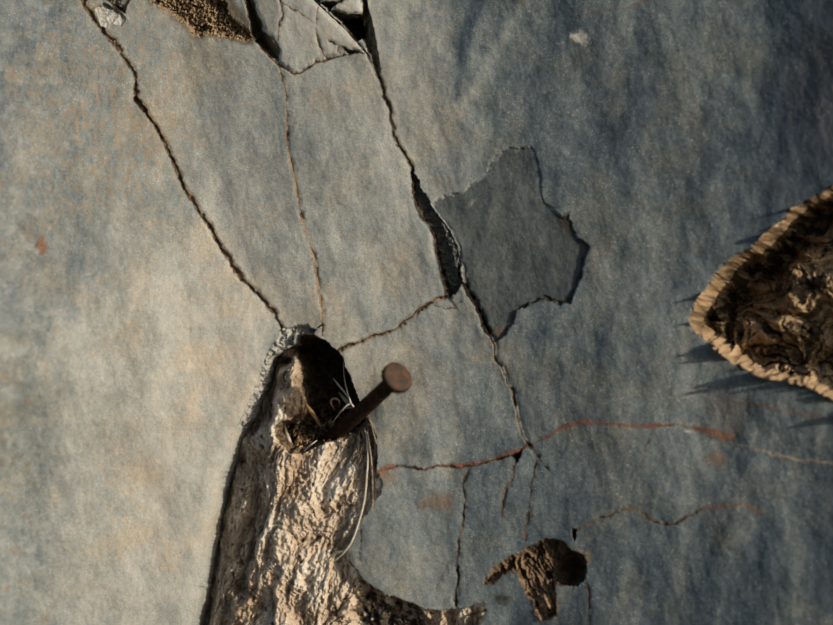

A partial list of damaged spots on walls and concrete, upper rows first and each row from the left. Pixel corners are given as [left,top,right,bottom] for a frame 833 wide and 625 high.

spalling [95,0,130,31]
spalling [152,0,260,45]
crack [81,0,284,329]
spalling [413,145,589,342]
crack [244,0,549,607]
spalling [238,324,316,429]
crack [572,440,709,541]
spalling [482,538,587,622]